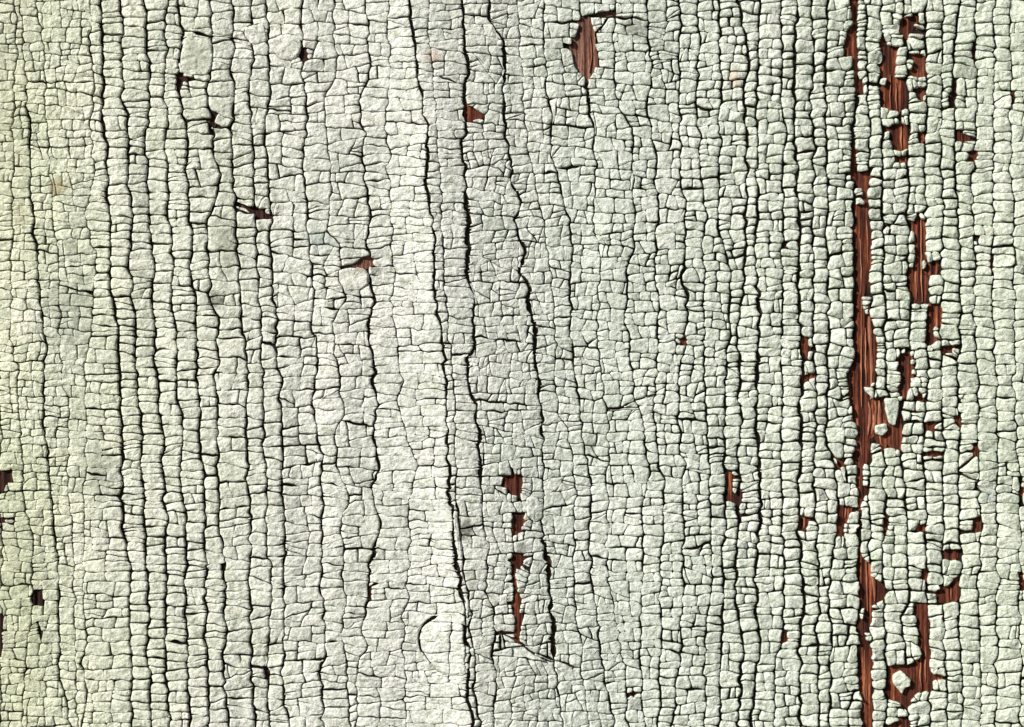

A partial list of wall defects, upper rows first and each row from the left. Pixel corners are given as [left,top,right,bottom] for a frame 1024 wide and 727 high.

crack [293,0,320,59]
peeling [561,3,615,89]
crack [990,0,1024,120]
peeling [237,195,294,231]
peeling [339,246,395,290]
peeling [782,0,1024,727]
peeling [709,472,760,531]
crack [972,396,1024,549]
peeling [494,460,545,661]
crack [624,686,648,727]
crack [867,601,894,727]
crack [988,703,1023,727]